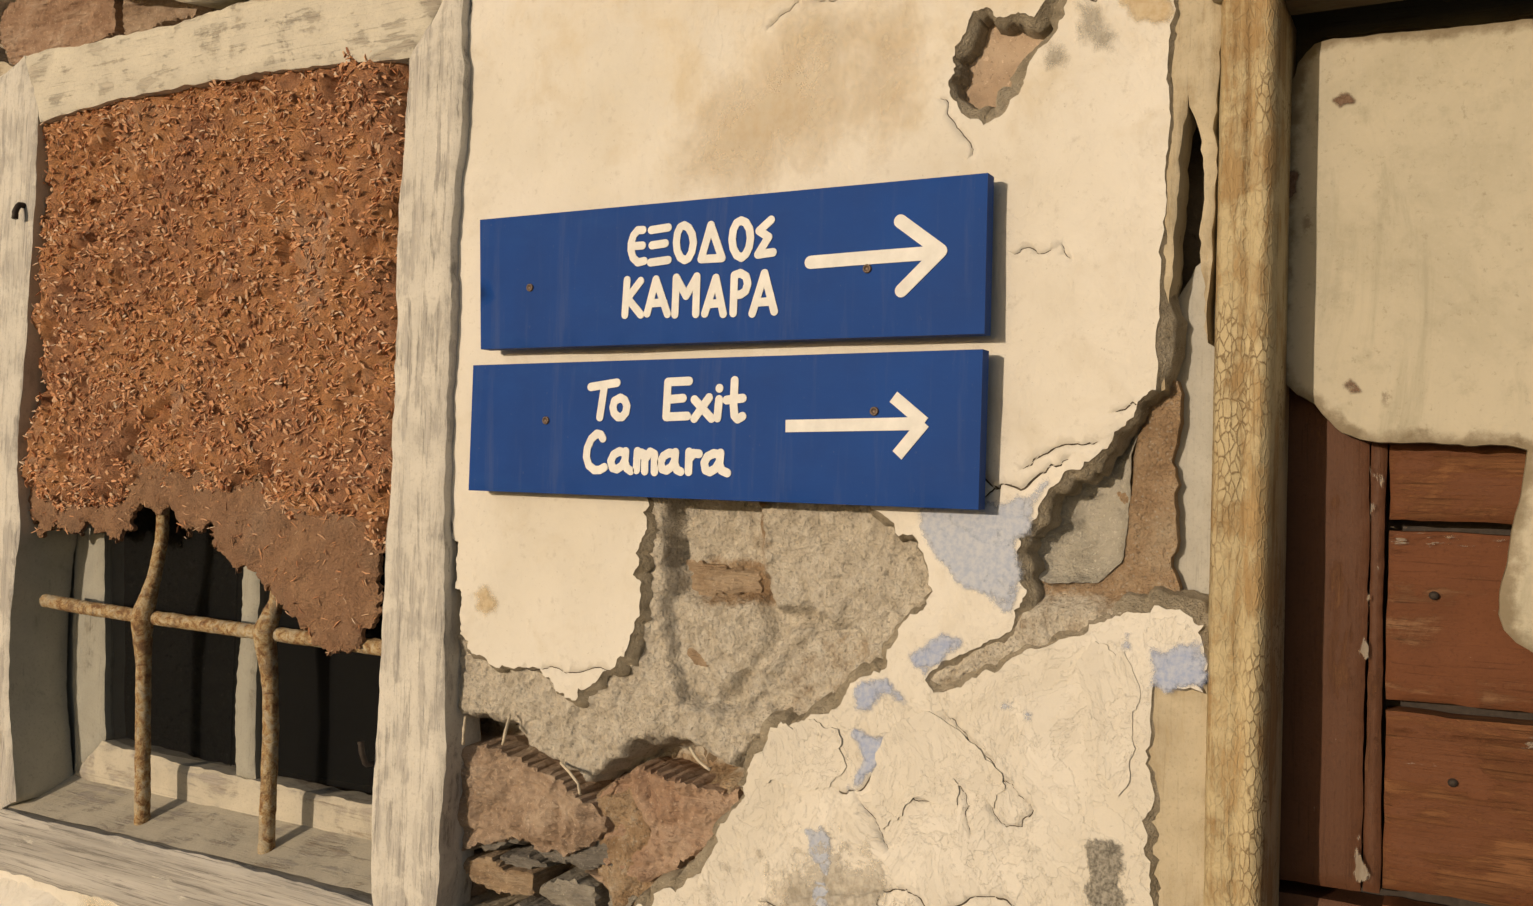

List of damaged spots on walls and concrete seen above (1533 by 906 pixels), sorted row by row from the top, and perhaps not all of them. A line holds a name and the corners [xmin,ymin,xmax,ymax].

flaking render [0,0,221,76]
flaking render [964,24,1043,109]
flaking render [931,380,1185,685]
peeling [1361,638,1369,659]
flaking render [457,497,932,906]
flaking render [851,711,1006,830]
crack [913,717,1033,829]
crack [839,776,889,849]
crack [876,889,1014,906]
flaking render [1084,839,1126,906]
peeling [1354,838,1370,882]